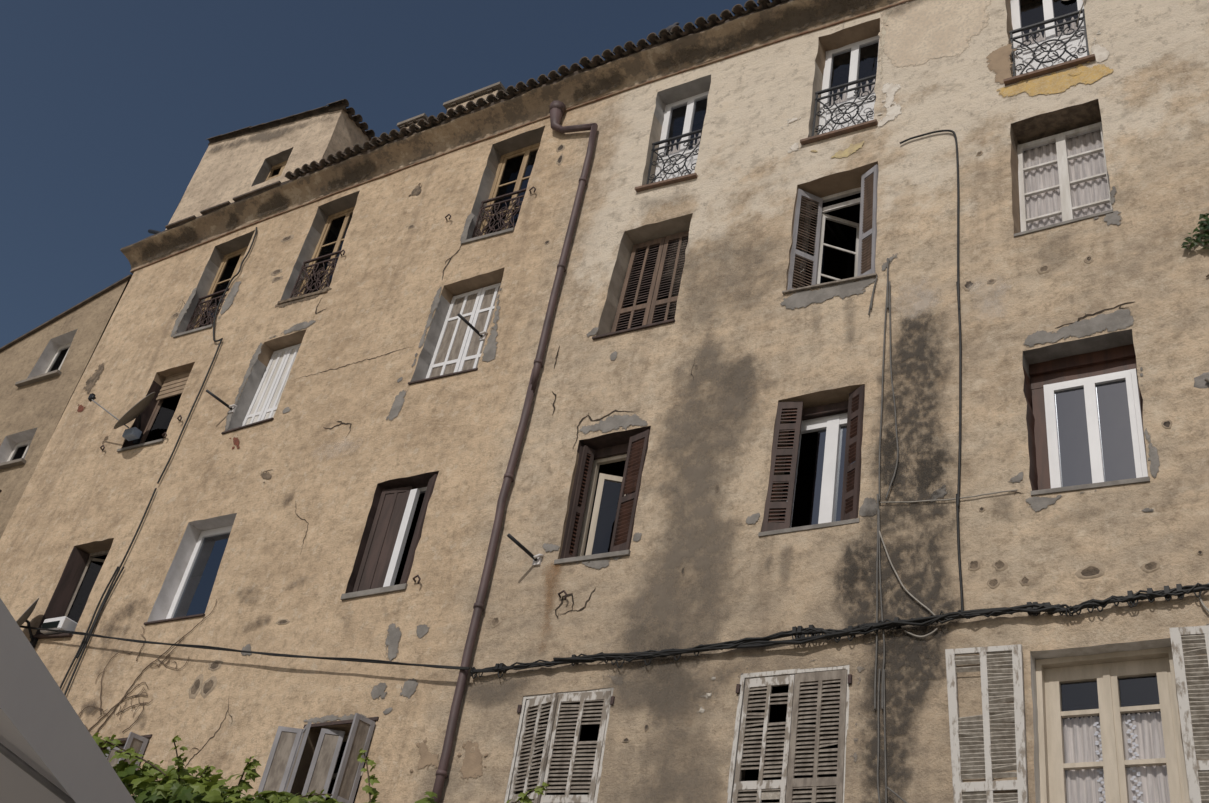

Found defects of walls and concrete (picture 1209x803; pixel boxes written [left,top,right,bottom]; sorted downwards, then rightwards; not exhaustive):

peeling [877,0,991,128]
peeling [986,30,1114,97]
leakage [617,342,756,803]
leakage [838,314,956,803]